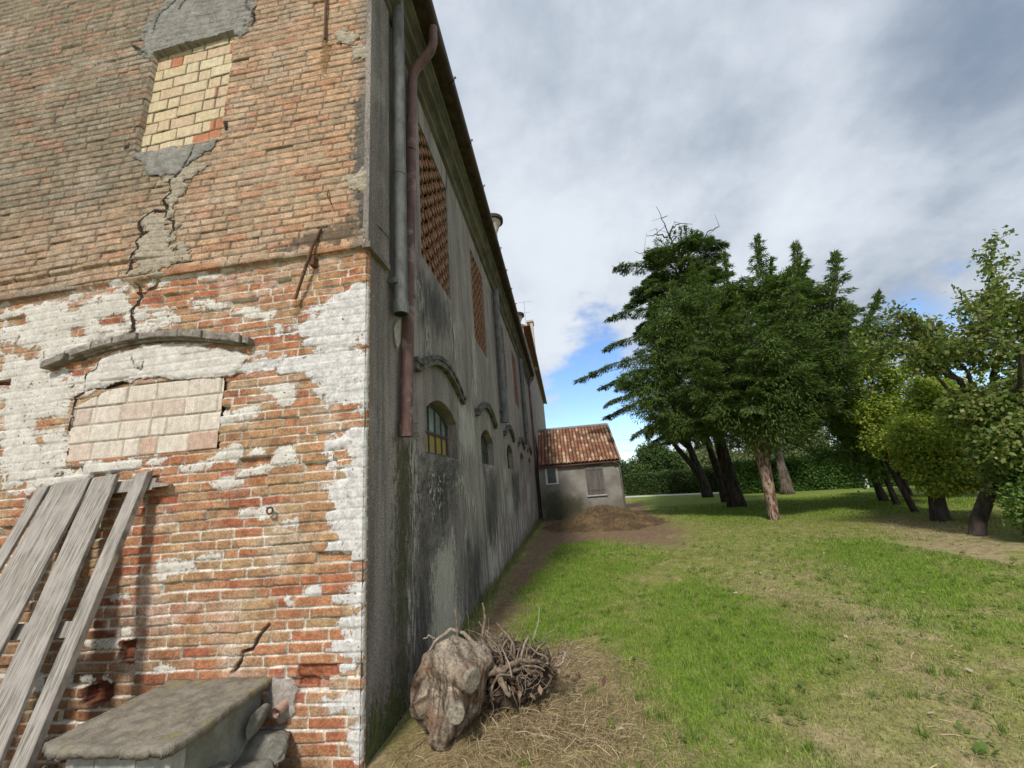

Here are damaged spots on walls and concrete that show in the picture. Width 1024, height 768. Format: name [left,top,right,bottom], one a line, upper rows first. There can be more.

crack [127,145,194,333]
peeling [0,268,370,561]
leakage [360,278,532,768]
peeling [154,552,224,582]
peeling [110,591,131,602]
peeling [84,625,137,664]
crack [235,627,268,671]
peeling [32,675,46,693]
spalling [80,673,116,708]
peeling [150,663,177,675]
peeling [281,581,366,765]